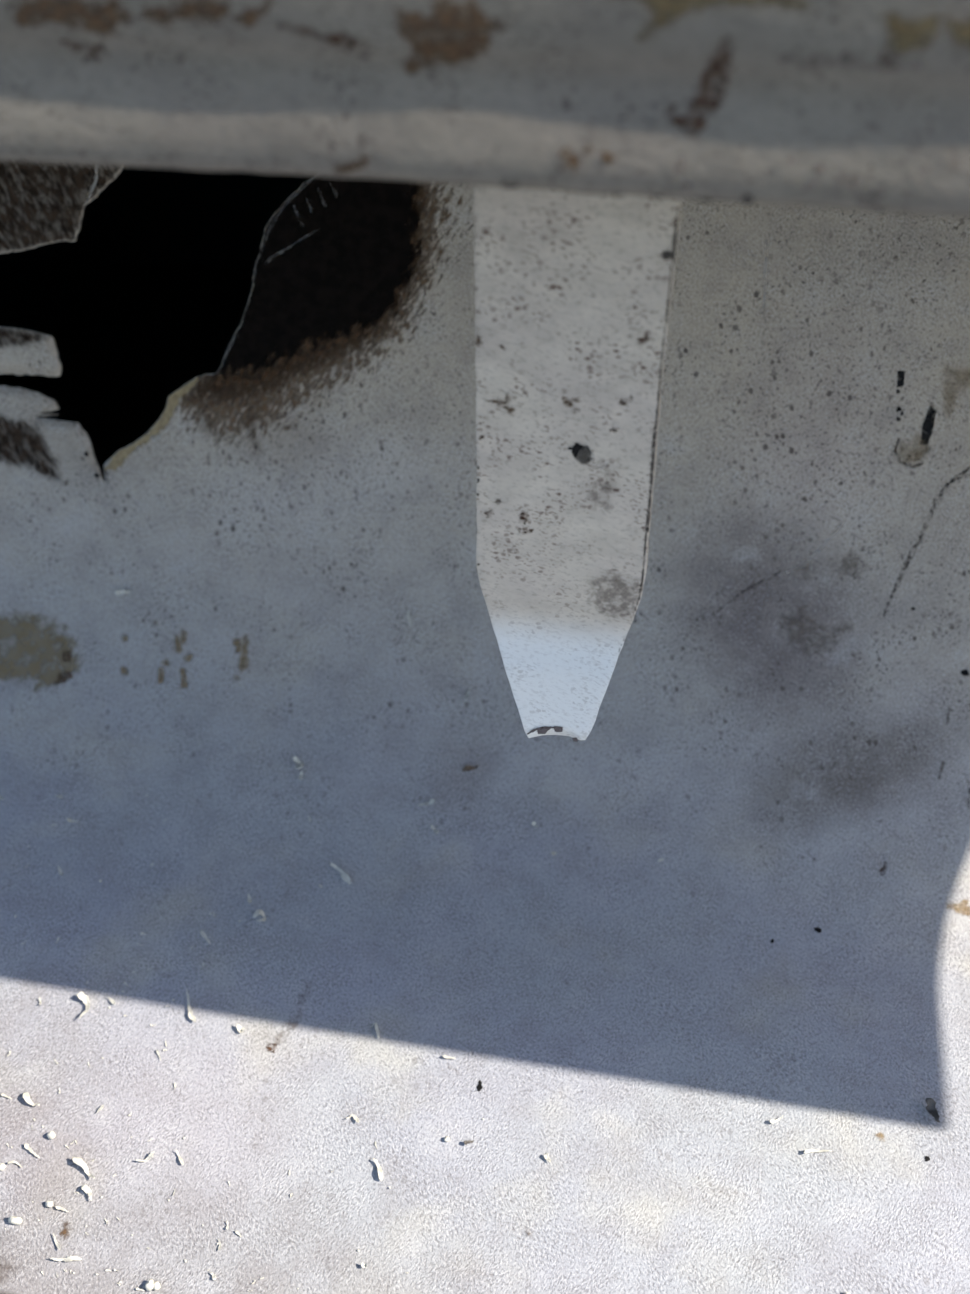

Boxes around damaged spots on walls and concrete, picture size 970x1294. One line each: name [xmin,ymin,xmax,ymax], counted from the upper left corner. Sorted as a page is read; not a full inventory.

corrosion [9,0,272,61]
corrosion [395,0,502,75]
corrosion [665,37,734,137]
crack [883,467,970,616]